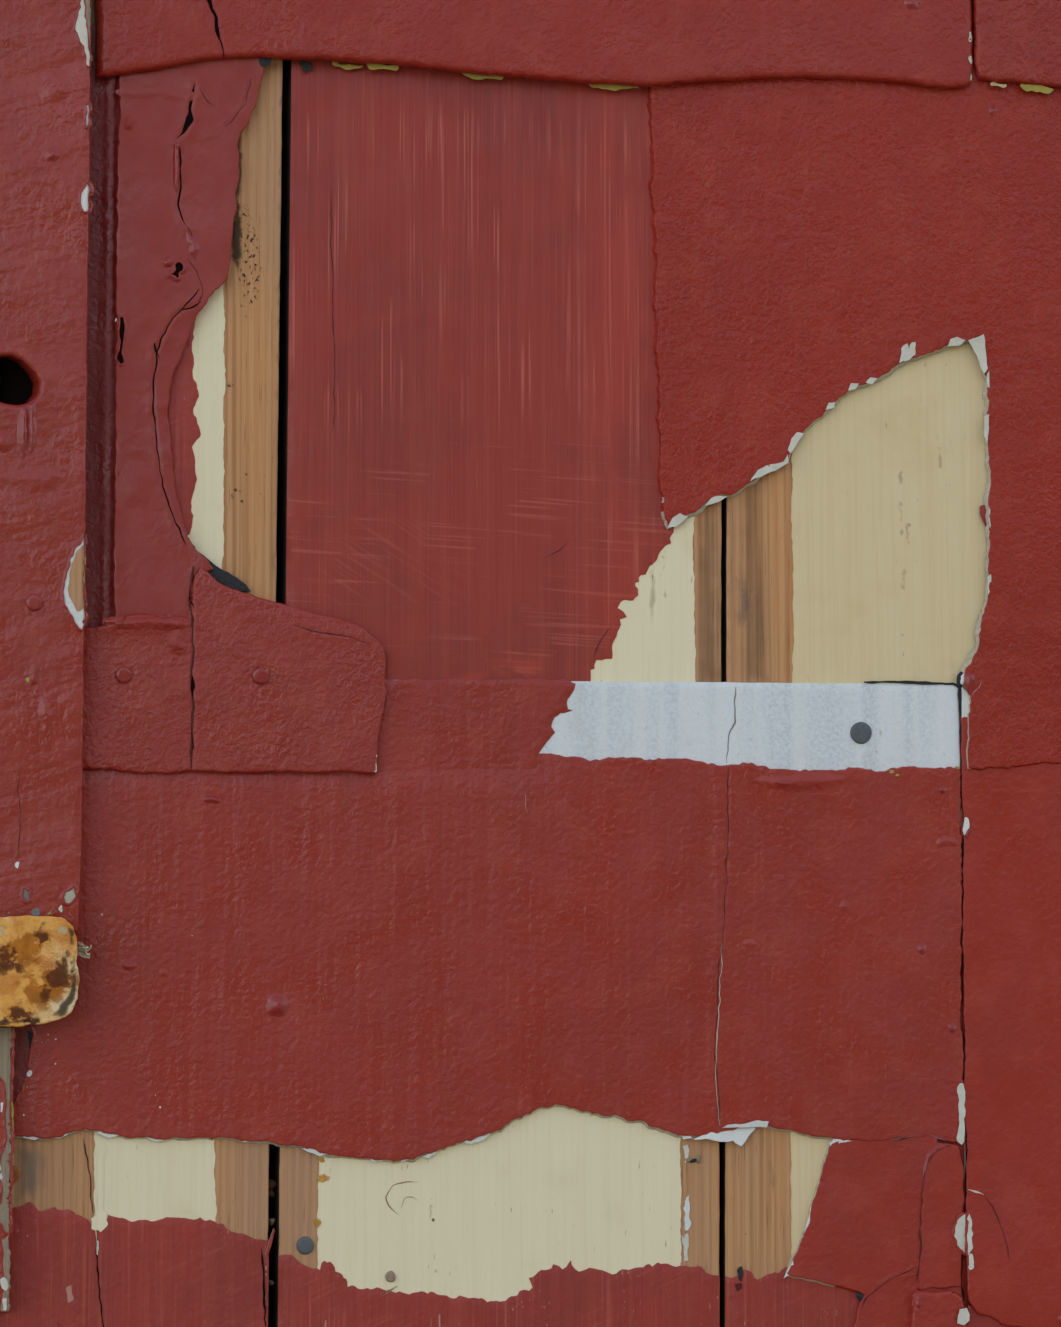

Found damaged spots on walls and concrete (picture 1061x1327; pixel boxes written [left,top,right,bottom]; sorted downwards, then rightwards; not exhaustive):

crack [207,0,224,58]
peeling [899,342,916,363]
peeling [948,334,989,388]
crack [152,78,251,769]
peeling [750,432,804,481]
peeling [60,532,89,632]
peeling [193,545,250,592]
crack [714,688,736,1125]
corrosion [0,929,76,1025]
crack [849,770,1010,1306]
peeling [0,1027,16,1311]
peeling [682,1144,691,1261]